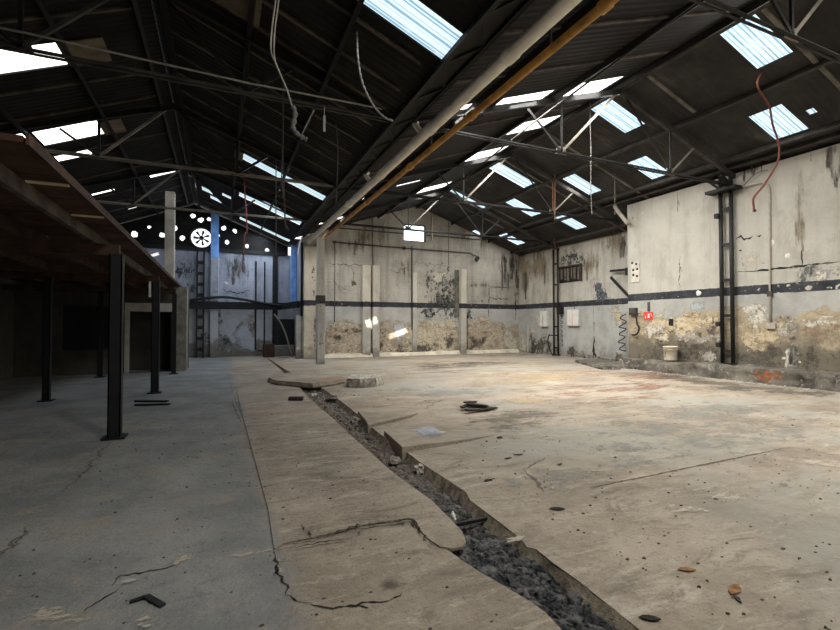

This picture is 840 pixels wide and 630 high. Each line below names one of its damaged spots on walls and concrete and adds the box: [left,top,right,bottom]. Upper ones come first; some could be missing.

leakage [826,147,840,187]
spalling [312,266,458,354]
mould [417,262,455,323]
spalling [468,316,506,350]
leakage [499,251,549,300]
peeling [634,301,727,344]
peeling [738,302,804,368]
crack [738,251,839,272]
crack [84,563,180,611]
crack [273,518,436,609]